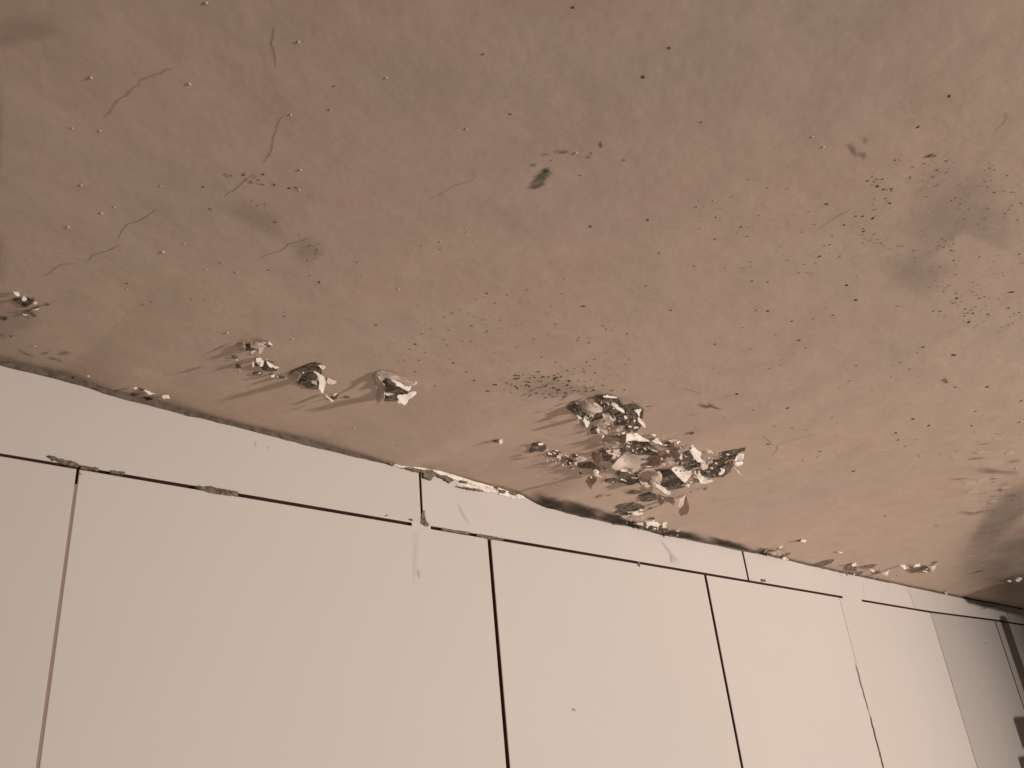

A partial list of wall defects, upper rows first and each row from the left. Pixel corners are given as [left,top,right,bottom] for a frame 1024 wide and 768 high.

water stain [532,164,548,189]
peeling [12,291,49,317]
peeling [231,342,349,402]
peeling [529,395,746,541]
flaking render [763,539,806,560]
flaking render [814,551,937,579]